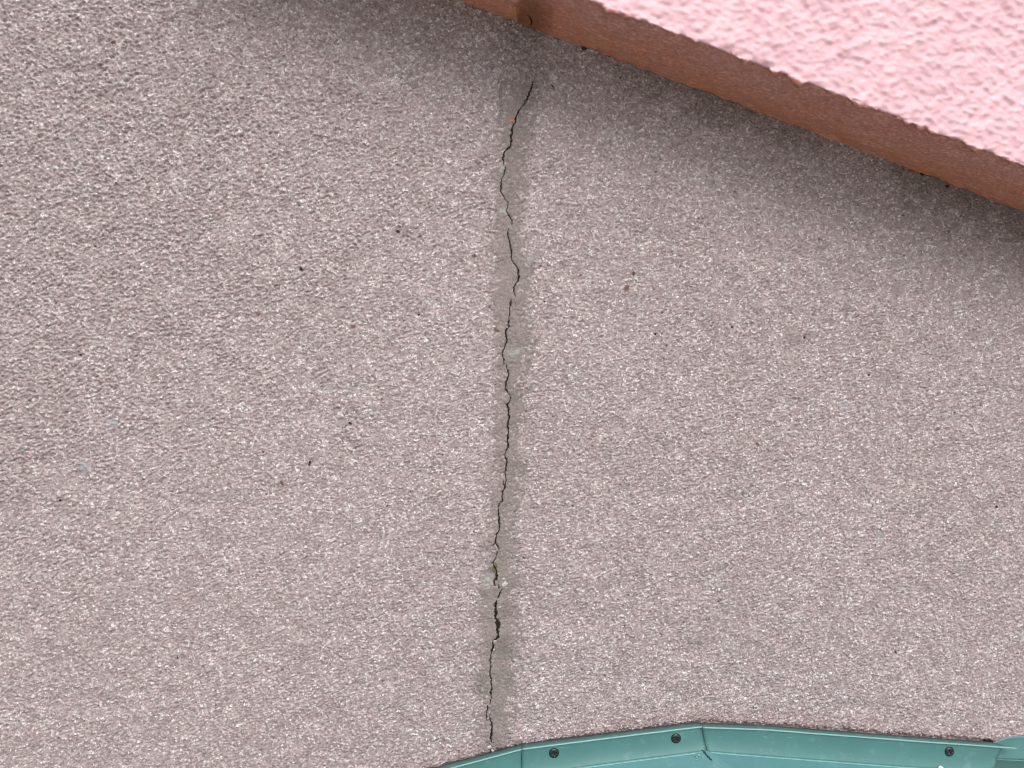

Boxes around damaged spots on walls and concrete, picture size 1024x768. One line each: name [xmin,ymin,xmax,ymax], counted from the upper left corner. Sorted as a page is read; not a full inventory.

crack [486,77,535,752]